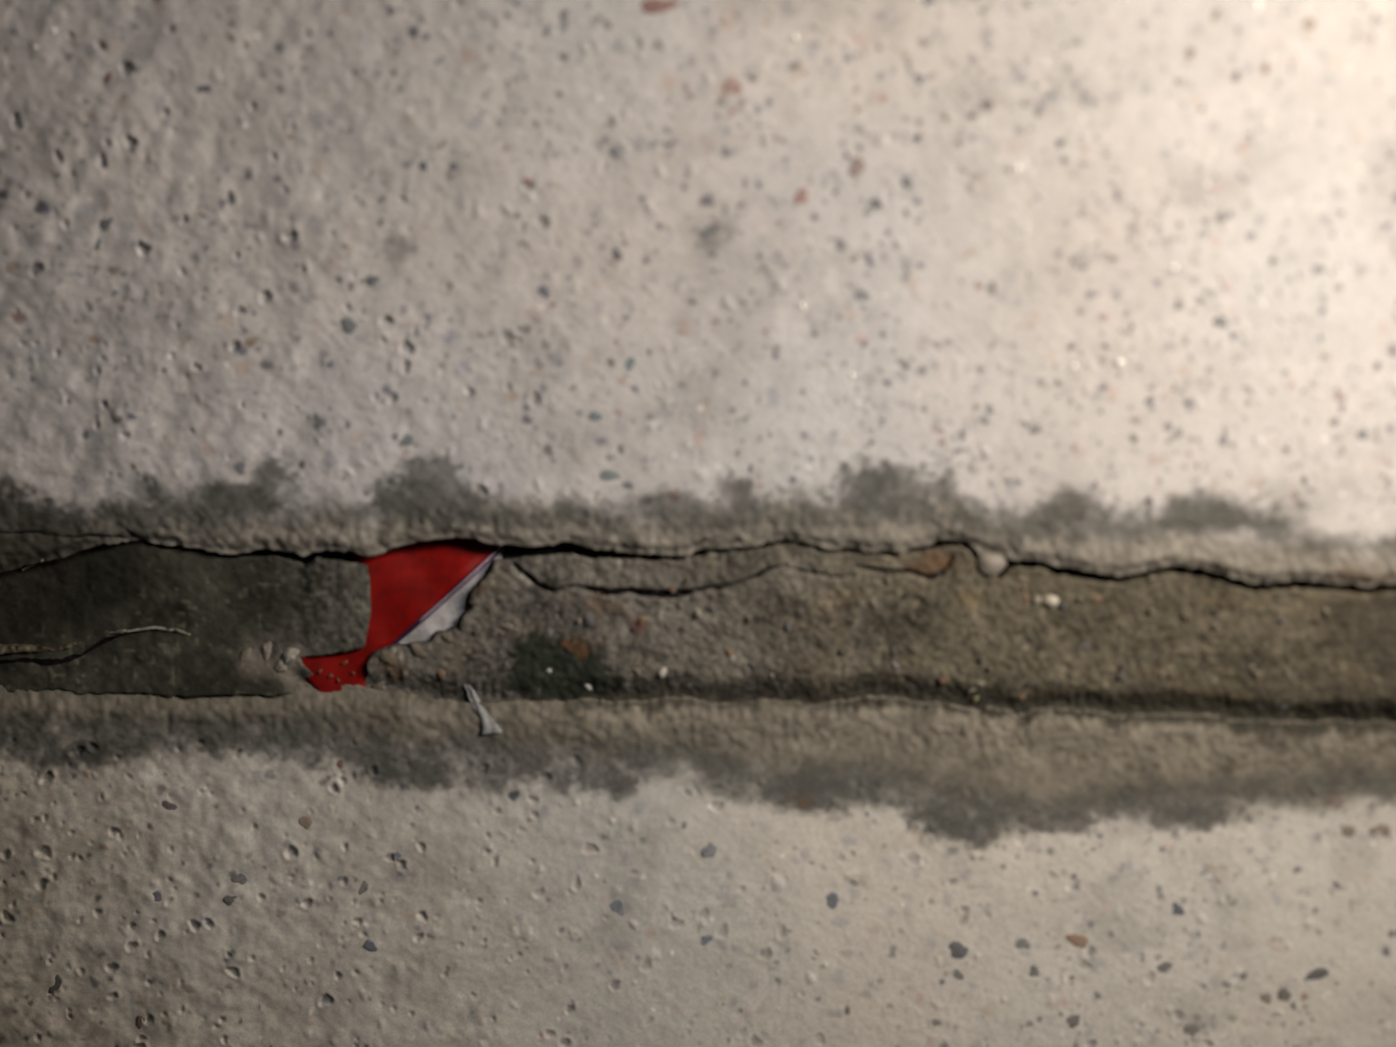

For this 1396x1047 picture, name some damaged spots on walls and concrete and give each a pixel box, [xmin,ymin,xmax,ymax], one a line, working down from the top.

water stain [0,459,283,572]
water stain [377,457,831,532]
water stain [845,457,1352,550]
crack [1,530,353,565]
crack [502,537,1396,599]
crack [0,634,126,665]
spalling [238,642,300,673]
water stain [842,683,1396,738]
water stain [0,714,1396,848]